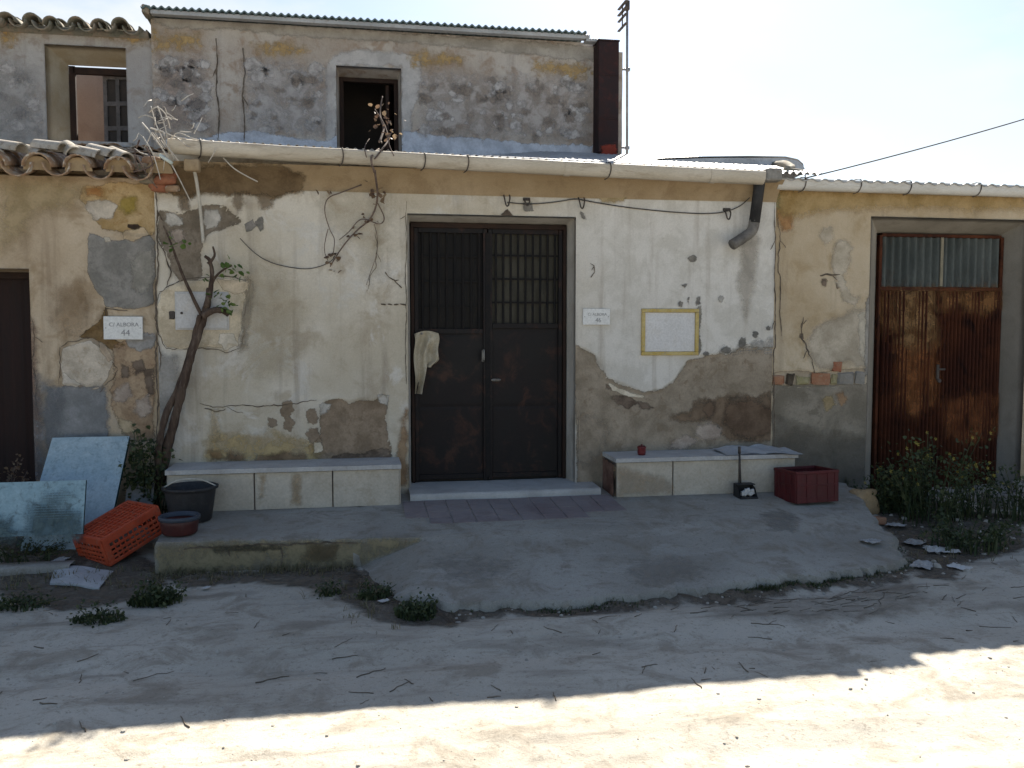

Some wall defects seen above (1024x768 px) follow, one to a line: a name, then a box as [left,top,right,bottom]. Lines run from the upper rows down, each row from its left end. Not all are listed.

flaking render [79,156,264,282]
flaking render [61,310,156,441]
crack [200,400,316,413]
flaking render [268,394,392,459]
flaking render [575,284,870,496]
crack [770,206,815,447]
corrosion [879,290,1003,417]